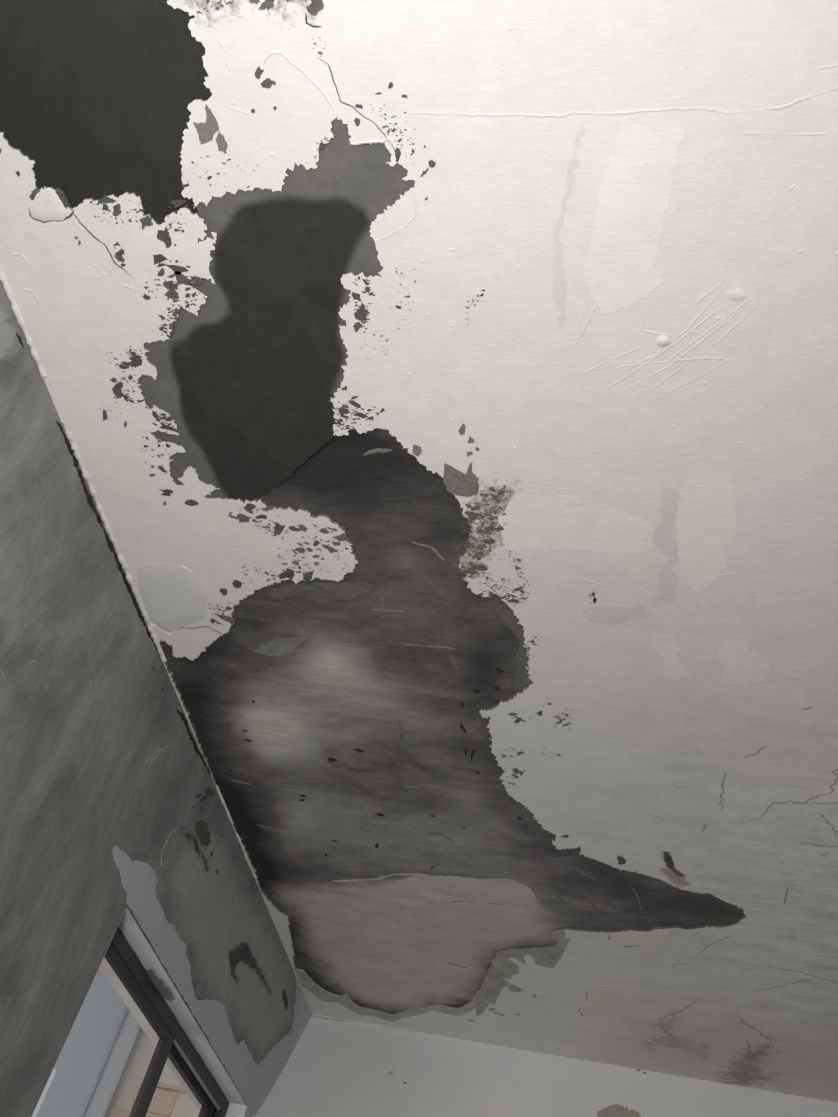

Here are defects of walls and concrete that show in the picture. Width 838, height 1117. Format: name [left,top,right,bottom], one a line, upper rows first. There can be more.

peeling [0,0,415,502]
damp [460,485,530,607]
flaking render [61,421,745,1117]
crack [702,745,838,856]
damp [663,852,684,876]
damp [145,969,174,1000]
damp [229,941,288,1009]